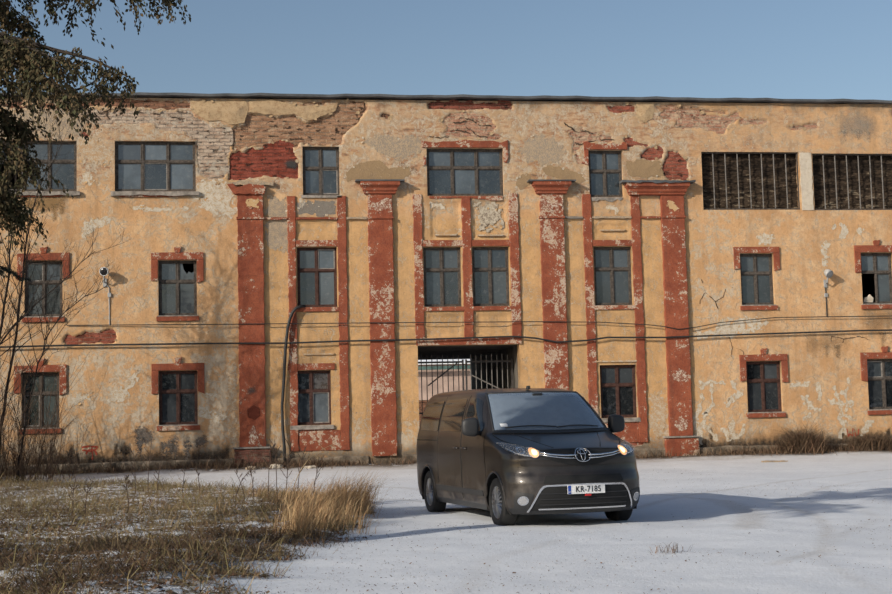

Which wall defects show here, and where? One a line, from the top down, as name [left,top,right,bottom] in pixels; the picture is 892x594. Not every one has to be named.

flaking render [77,98,367,219]